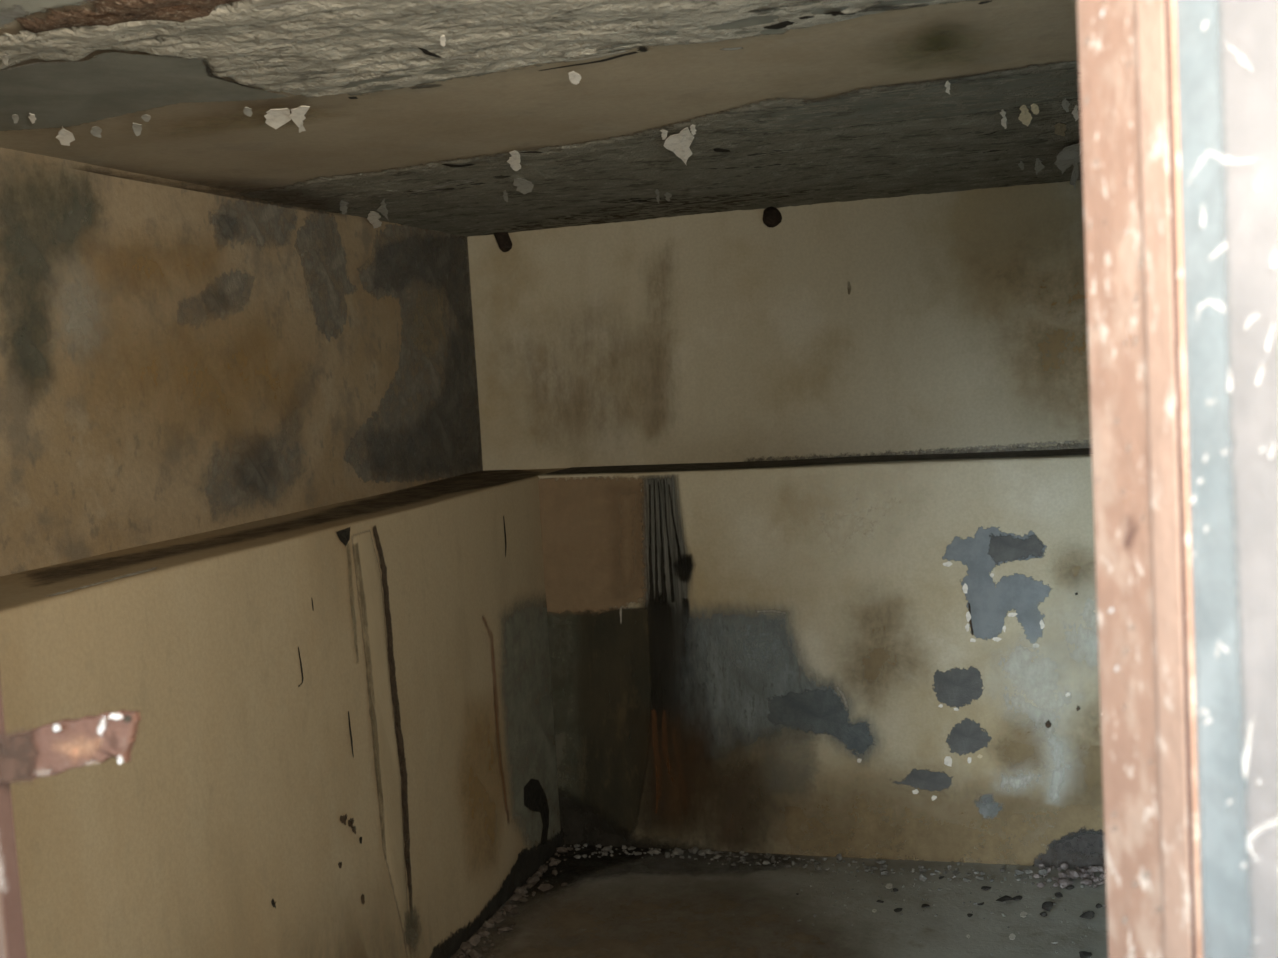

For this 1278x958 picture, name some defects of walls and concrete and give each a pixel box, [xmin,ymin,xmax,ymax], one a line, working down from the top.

spalling [0,0,972,146]
water stain [87,171,332,213]
water stain [0,172,96,378]
water stain [1009,263,1090,397]
peeling [942,527,1051,648]
rust [0,731,37,784]
water stain [31,448,1104,958]
peeling [677,610,874,764]
peeling [893,666,992,801]